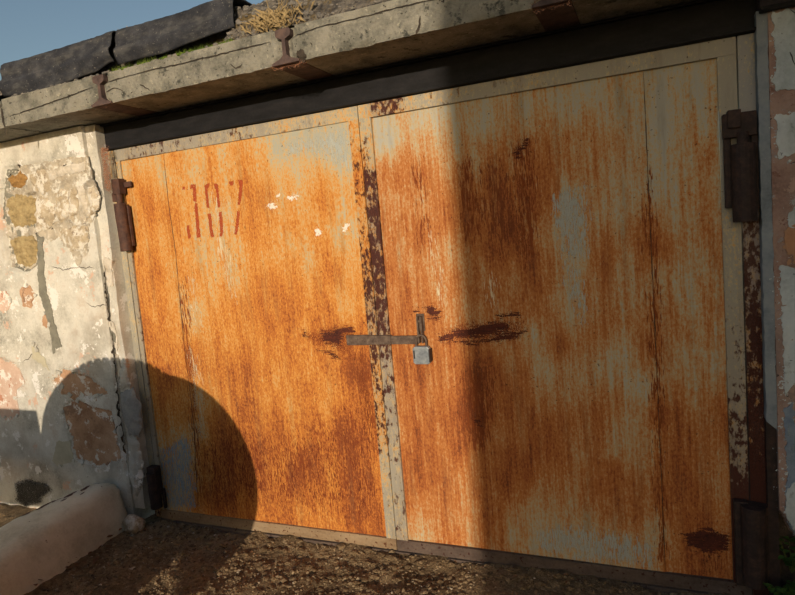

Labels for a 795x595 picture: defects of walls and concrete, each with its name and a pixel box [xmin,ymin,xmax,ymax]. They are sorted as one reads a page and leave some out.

crack [295,0,430,59]
peeling [763,8,795,94]
flaking render [0,156,101,272]
rust [456,134,542,273]
peeling [0,353,27,425]
crack [23,228,127,463]
peeling [31,342,123,470]
rust [176,277,384,531]
rust [413,303,528,349]
rust [640,168,672,562]
flaking render [764,197,795,595]
rust [678,525,732,575]